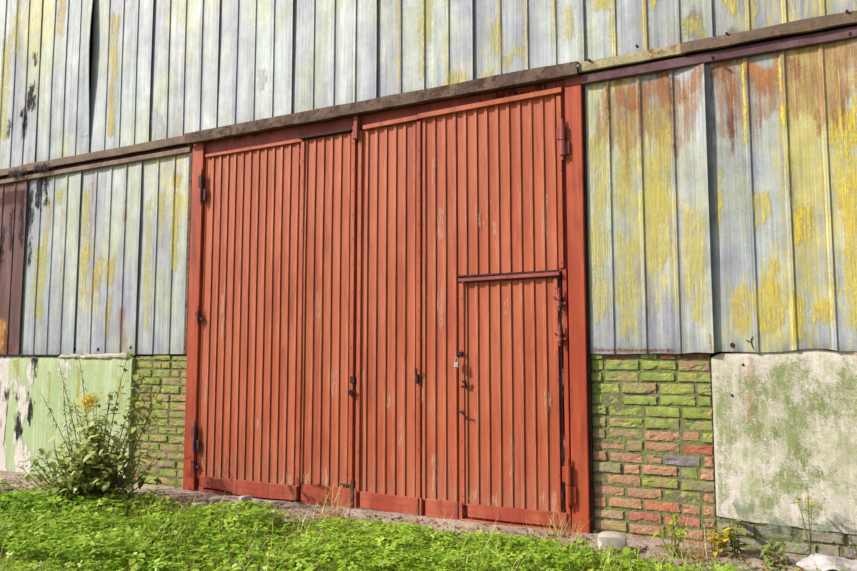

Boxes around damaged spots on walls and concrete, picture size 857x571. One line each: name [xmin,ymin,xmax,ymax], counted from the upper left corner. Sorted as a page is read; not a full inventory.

corrosion [597,41,857,156]
corrosion [0,318,11,354]
peeling [57,358,72,381]
peeling [0,360,35,473]
leakage [732,501,754,520]